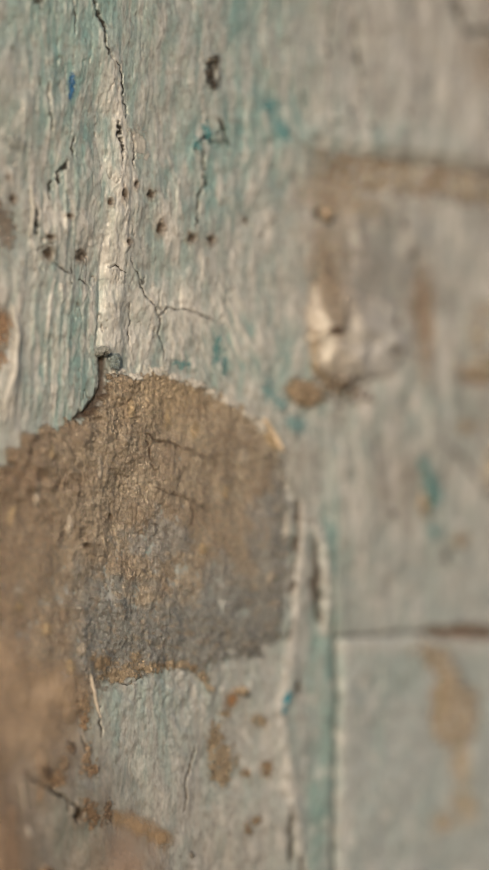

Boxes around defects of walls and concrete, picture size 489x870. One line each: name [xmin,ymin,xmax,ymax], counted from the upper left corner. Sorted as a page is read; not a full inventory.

crack [74,0,135,166]
crack [27,138,86,285]
crack [194,119,230,224]
peeling [0,306,15,370]
crack [112,261,234,357]
crack [146,434,235,526]
spalling [0,365,292,723]
crack [23,770,78,812]